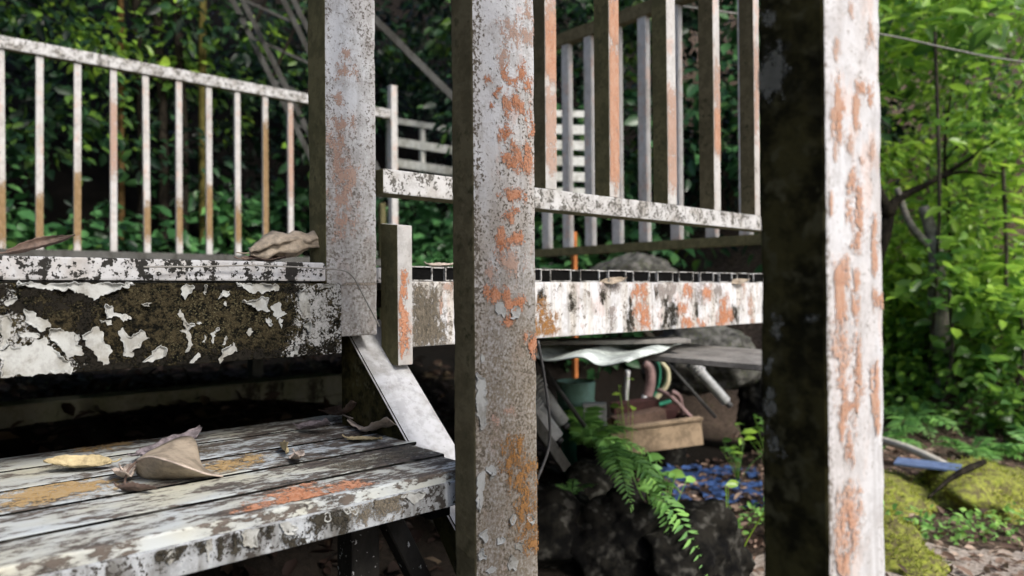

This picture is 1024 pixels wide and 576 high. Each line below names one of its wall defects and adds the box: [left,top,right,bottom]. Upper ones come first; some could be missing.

rust [482,0,561,360]
peeling [0,280,168,378]
peeling [178,282,342,363]
rust [398,269,412,360]
rust [631,283,653,330]
rust [676,283,734,328]
rust [830,38,884,576]
peeling [241,528,260,549]
peeling [279,521,298,536]
rust [229,478,373,514]
peeling [327,445,435,470]
rust [489,406,539,557]